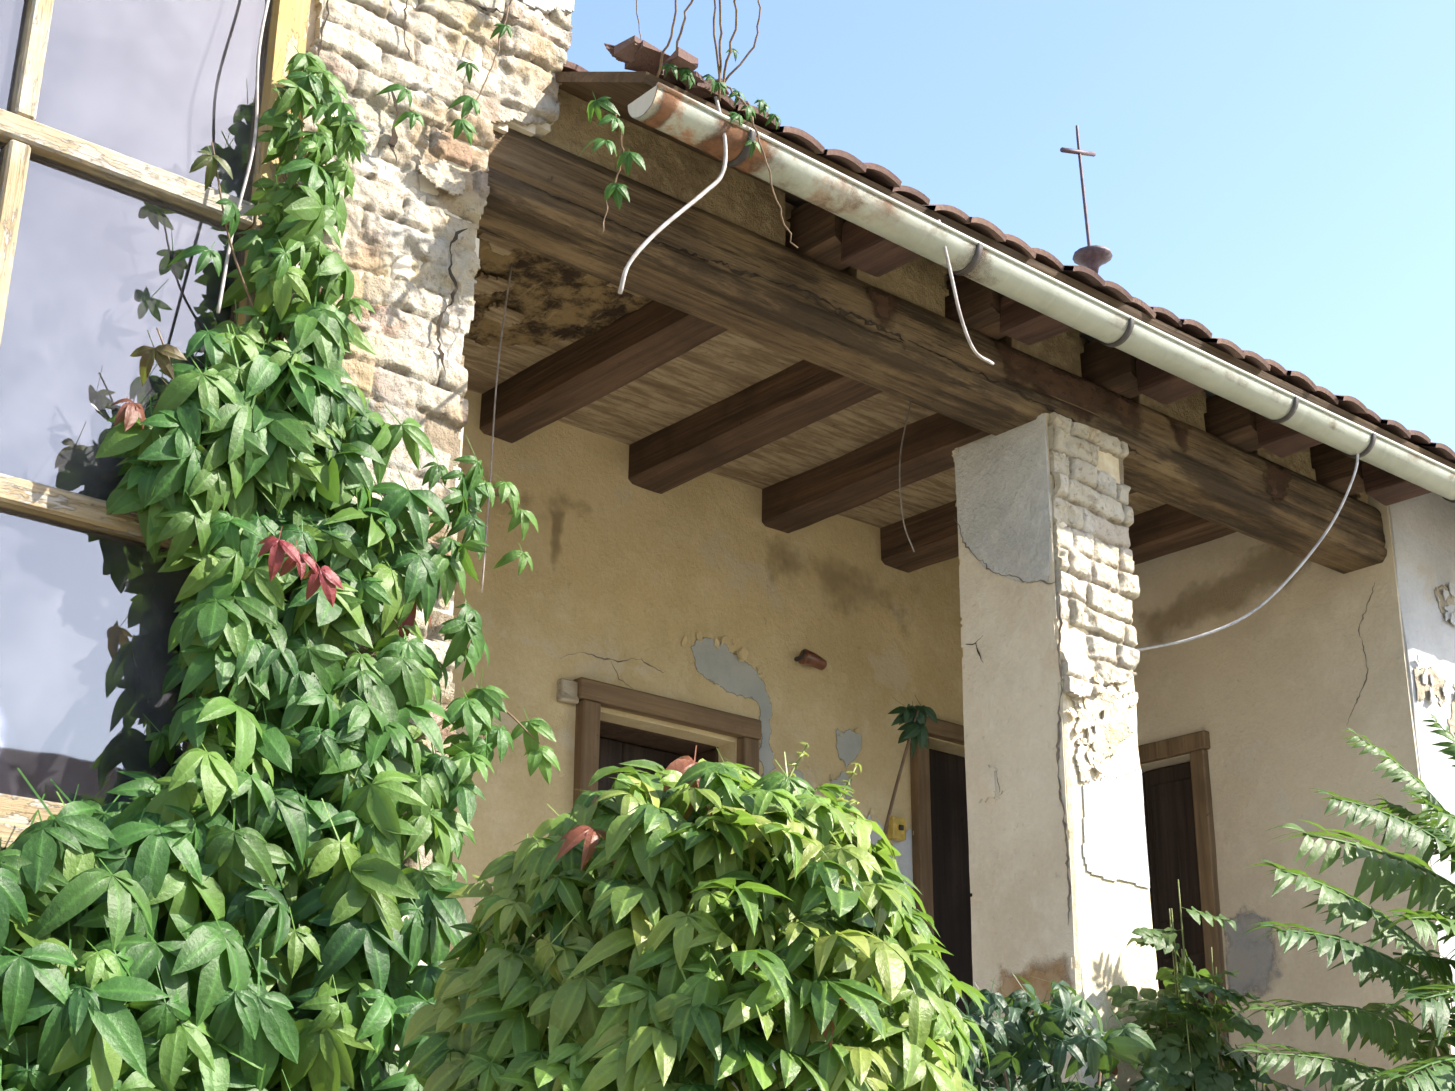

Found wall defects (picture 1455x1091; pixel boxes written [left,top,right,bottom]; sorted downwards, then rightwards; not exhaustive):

crack [402,0,412,60]
crack [467,0,519,19]
flaking render [299,98,325,158]
crack [388,91,400,163]
corrosion [639,91,677,128]
corrosion [690,118,772,183]
flaking render [307,0,573,556]
crack [437,228,468,375]
flaking render [1048,412,1140,782]
flaking render [394,579,458,757]
crack [1347,583,1375,724]
flaking render [403,843,433,871]